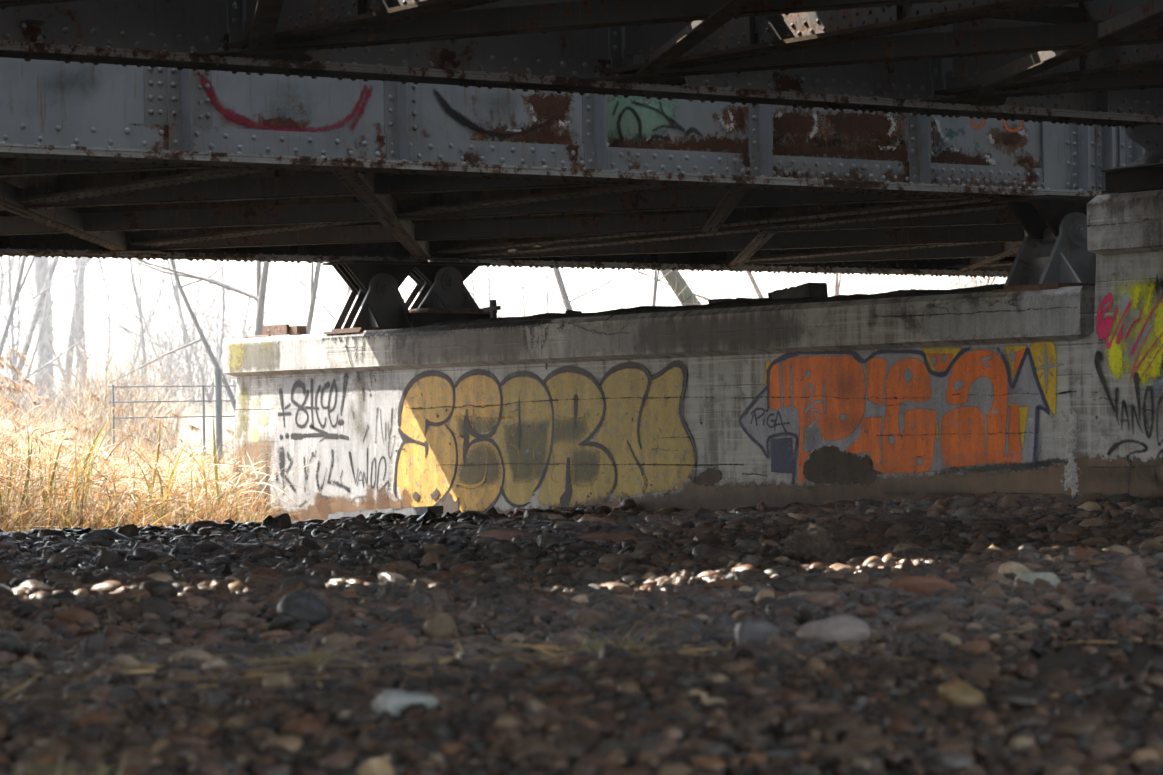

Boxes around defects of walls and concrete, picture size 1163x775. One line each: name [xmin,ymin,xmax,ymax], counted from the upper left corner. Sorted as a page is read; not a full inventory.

leakage [227,332,411,522]
leakage [529,409,1163,511]